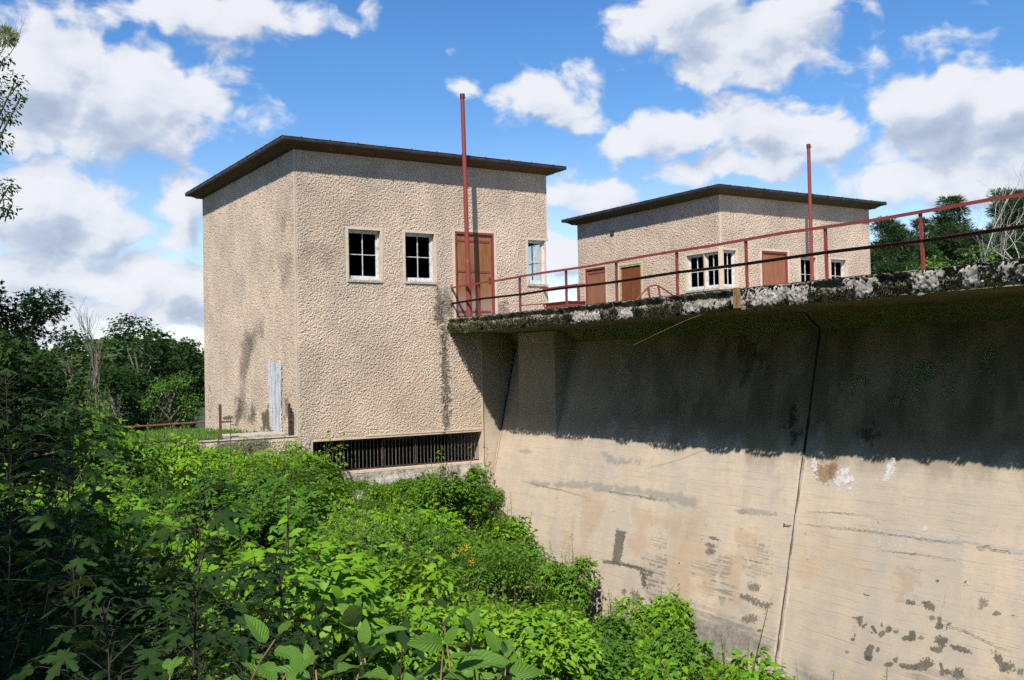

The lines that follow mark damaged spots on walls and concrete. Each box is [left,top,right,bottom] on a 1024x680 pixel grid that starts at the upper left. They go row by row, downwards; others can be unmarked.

water stain [433,287,452,433]
rust [814,463,837,481]
water stain [603,528,653,635]
water stain [685,584,773,656]
water stain [851,616,916,661]
water stain [884,599,970,680]
water stain [994,650,1016,673]